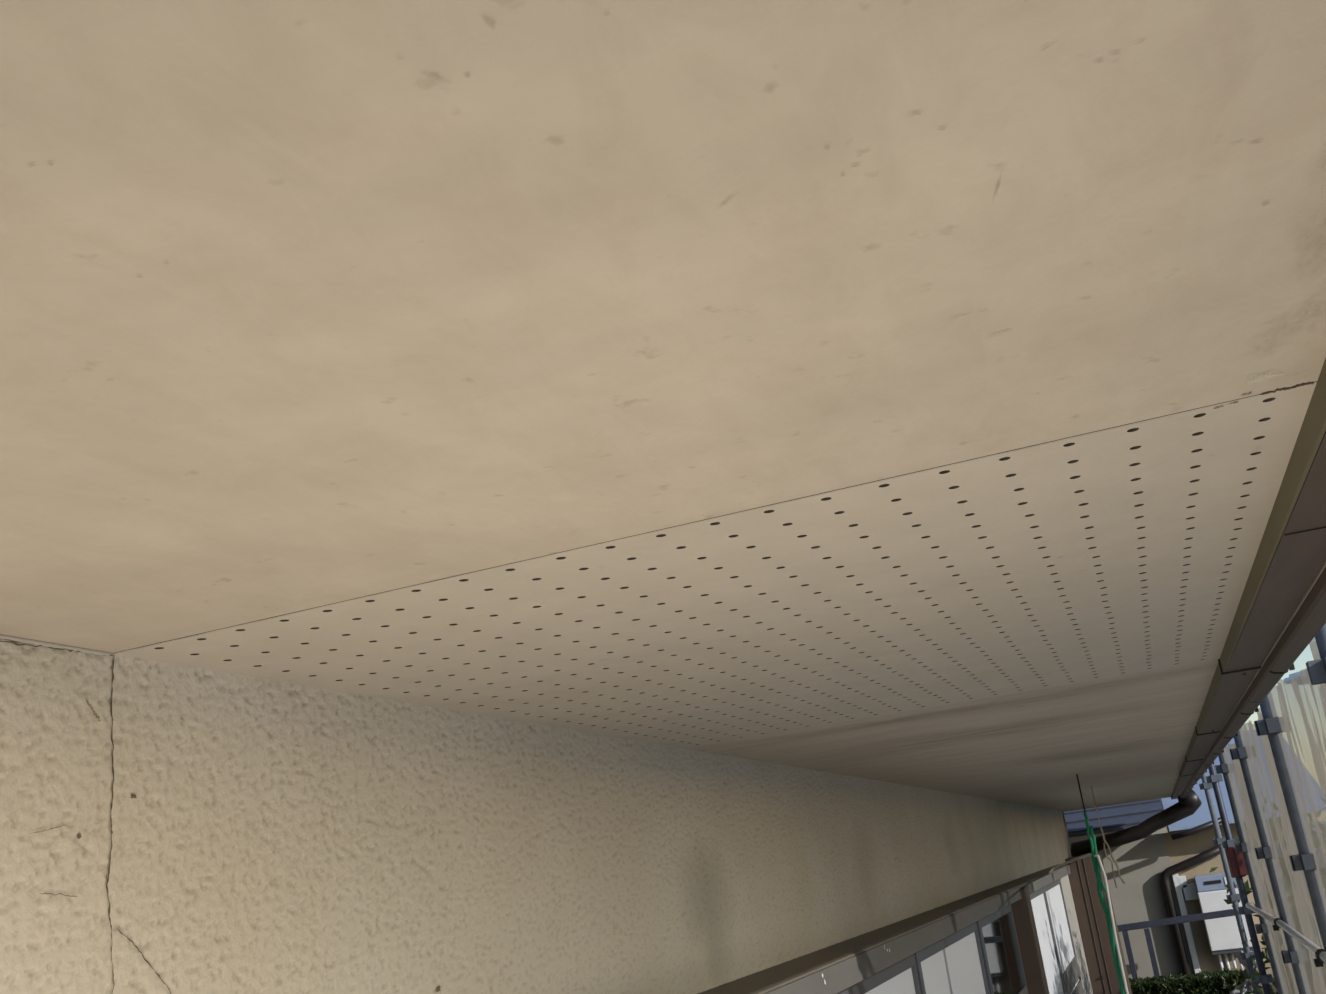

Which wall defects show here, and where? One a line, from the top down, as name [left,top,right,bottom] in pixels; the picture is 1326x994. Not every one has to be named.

crack [40,660,171,994]